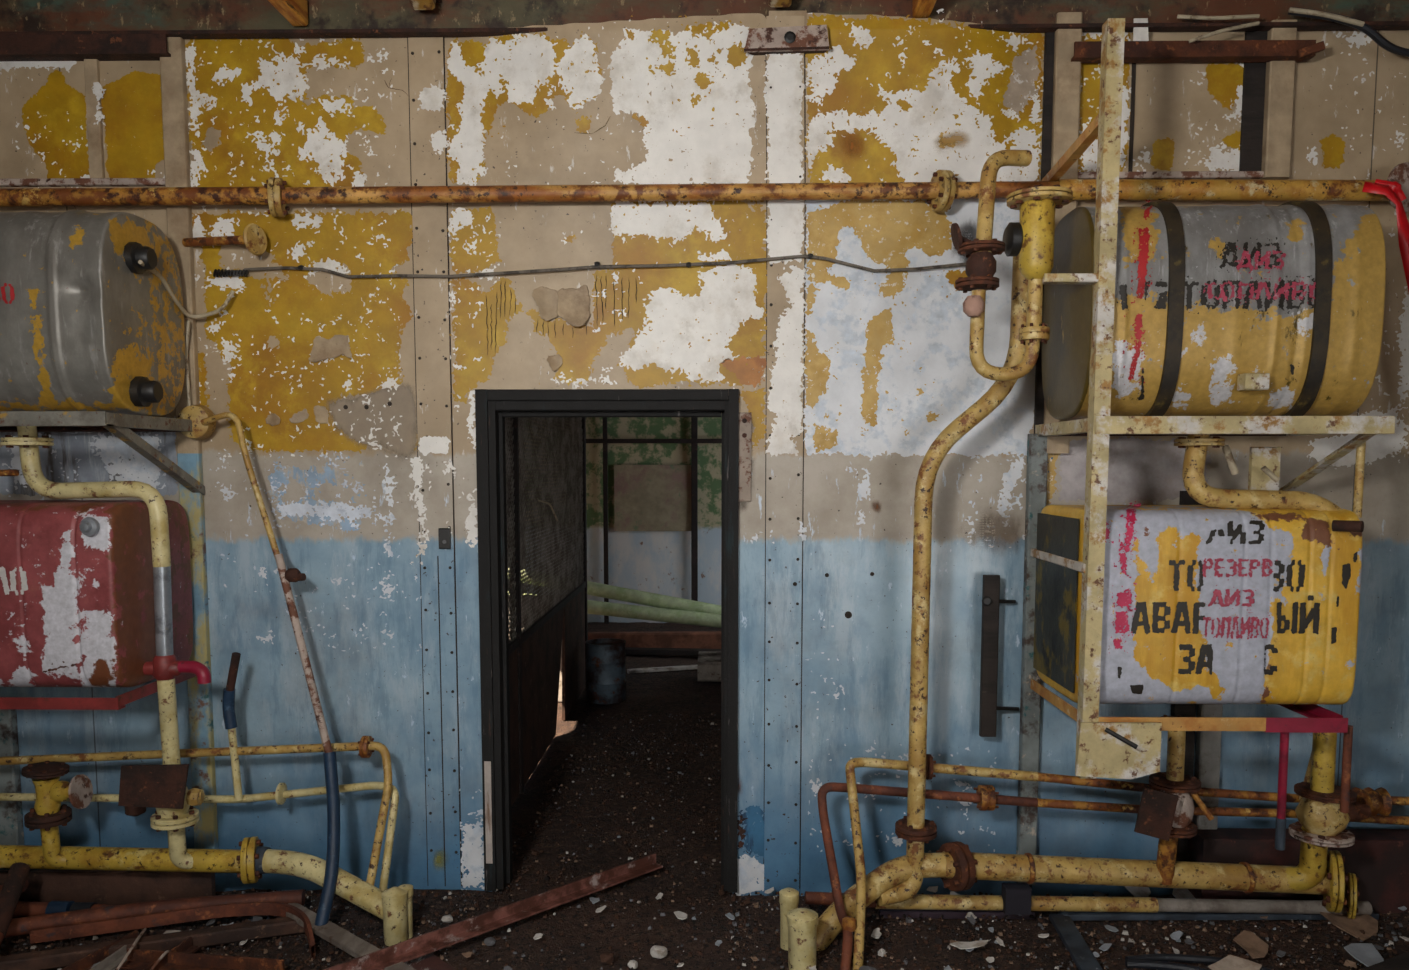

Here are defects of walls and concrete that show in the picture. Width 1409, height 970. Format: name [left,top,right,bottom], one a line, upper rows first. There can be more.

peeling [0,61,165,188]
peeling [185,38,396,187]
peeling [417,9,1045,186]
peeling [192,198,1020,651]
peeling [947,364,1036,548]
peeling [806,652,845,719]